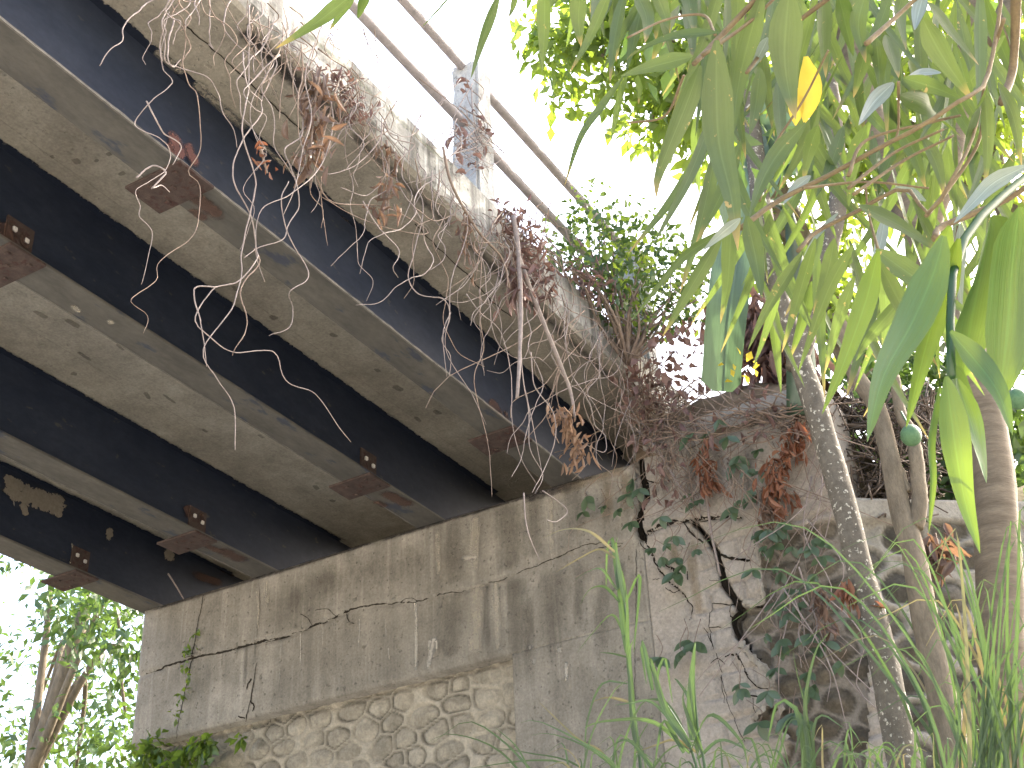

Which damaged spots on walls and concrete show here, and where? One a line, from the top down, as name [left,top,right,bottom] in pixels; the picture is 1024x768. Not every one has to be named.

crack [184,24,301,130]
corrosion [167,132,199,166]
corrosion [189,195,222,221]
peeling [0,454,175,561]
water stain [385,477,591,572]
water stain [162,543,368,617]
crack [146,458,768,742]